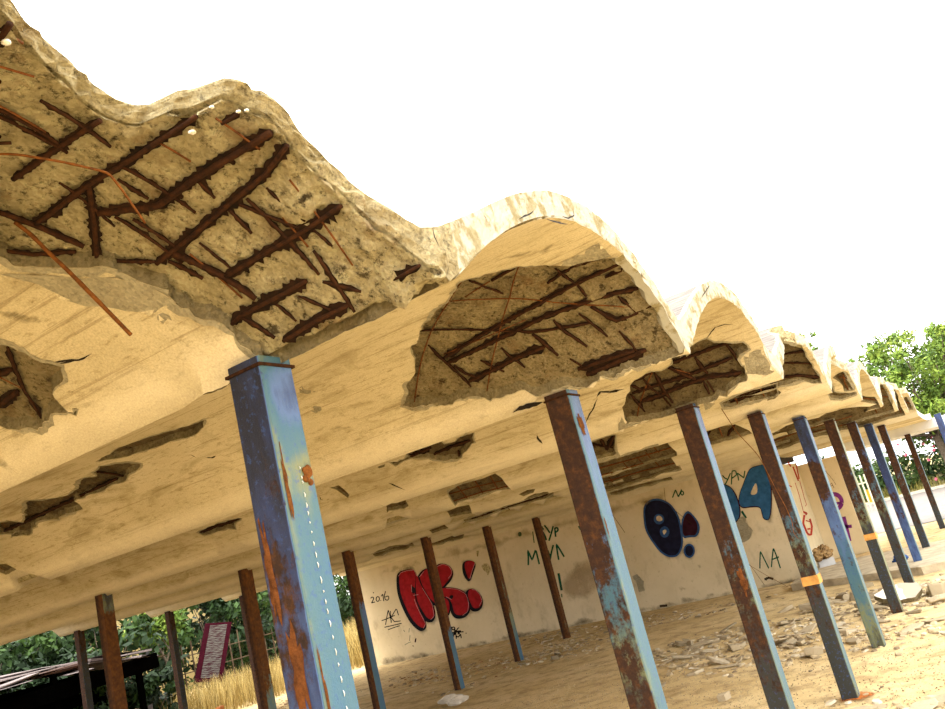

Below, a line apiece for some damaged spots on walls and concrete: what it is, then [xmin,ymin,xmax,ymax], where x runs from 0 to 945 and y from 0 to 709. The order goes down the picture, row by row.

spalling [0,18,449,363]
spalling [0,338,79,435]
spalling [389,243,911,495]
spalling [0,419,207,538]
rust [279,442,295,520]
rust [302,464,314,485]
spalling [431,525,463,546]
spalling [446,474,554,522]
rust [258,518,312,709]
rust [736,567,748,597]
rust [316,644,331,709]